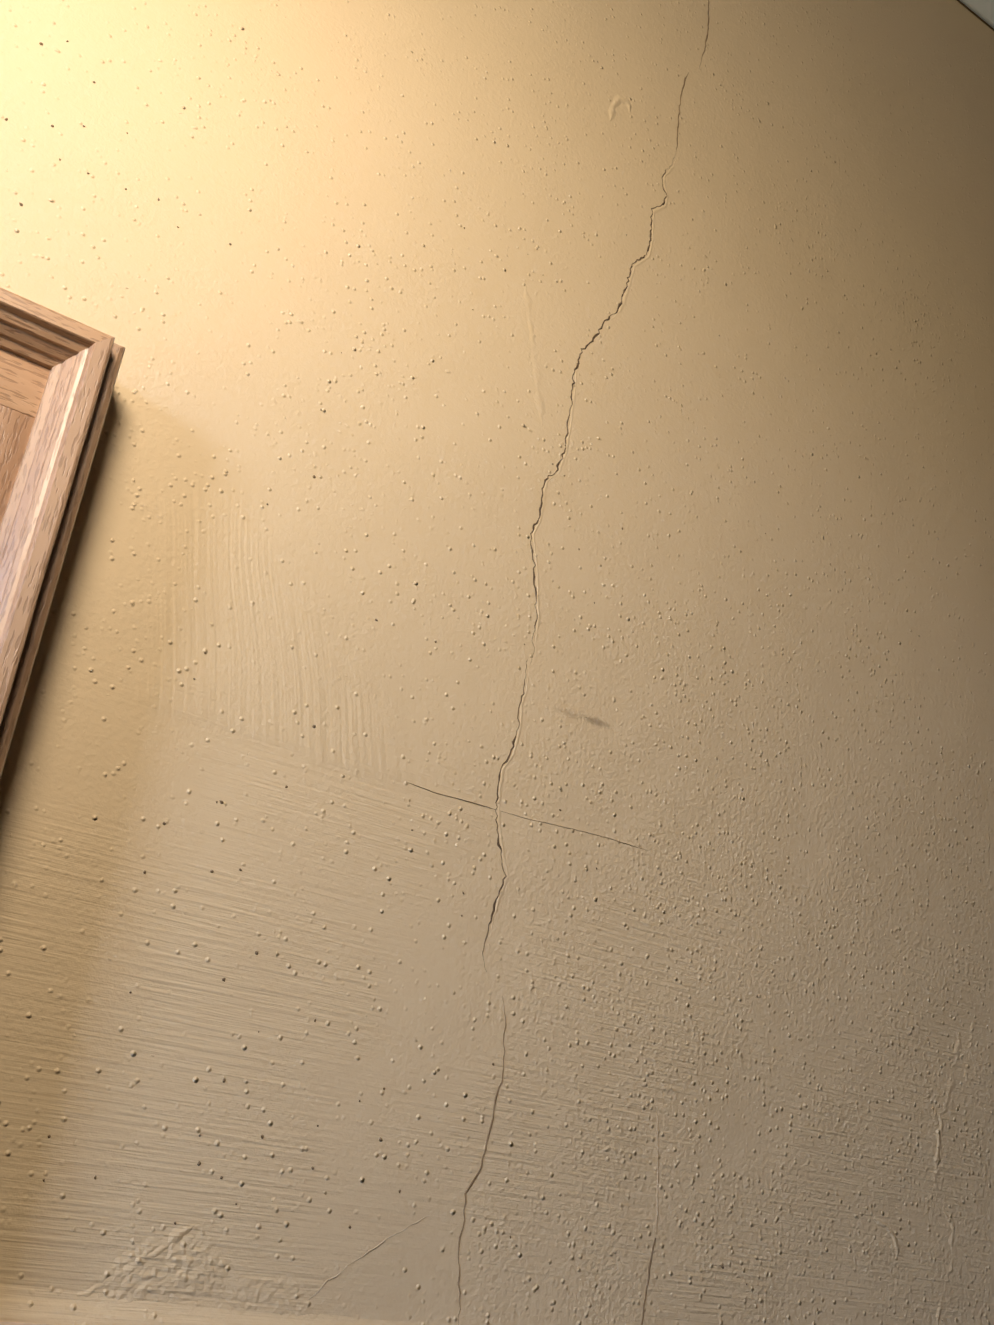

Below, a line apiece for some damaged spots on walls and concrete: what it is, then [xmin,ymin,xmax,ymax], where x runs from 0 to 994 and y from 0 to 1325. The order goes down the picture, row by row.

crack [410,0,709,1325]
crack [957,0,994,31]